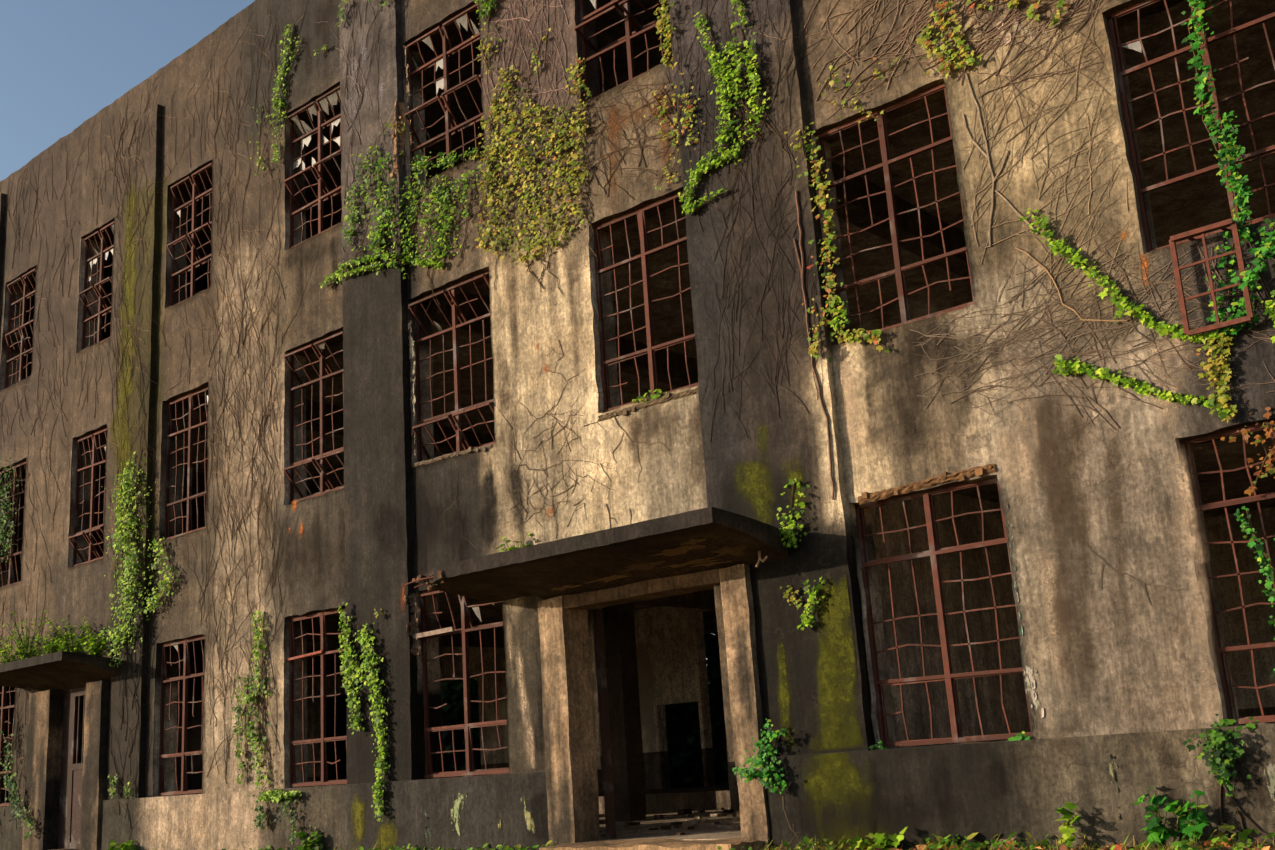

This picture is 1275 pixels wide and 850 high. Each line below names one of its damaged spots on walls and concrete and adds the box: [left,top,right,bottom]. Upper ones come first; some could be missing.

leakage [1002,398,1087,546]
leakage [1177,464,1197,552]